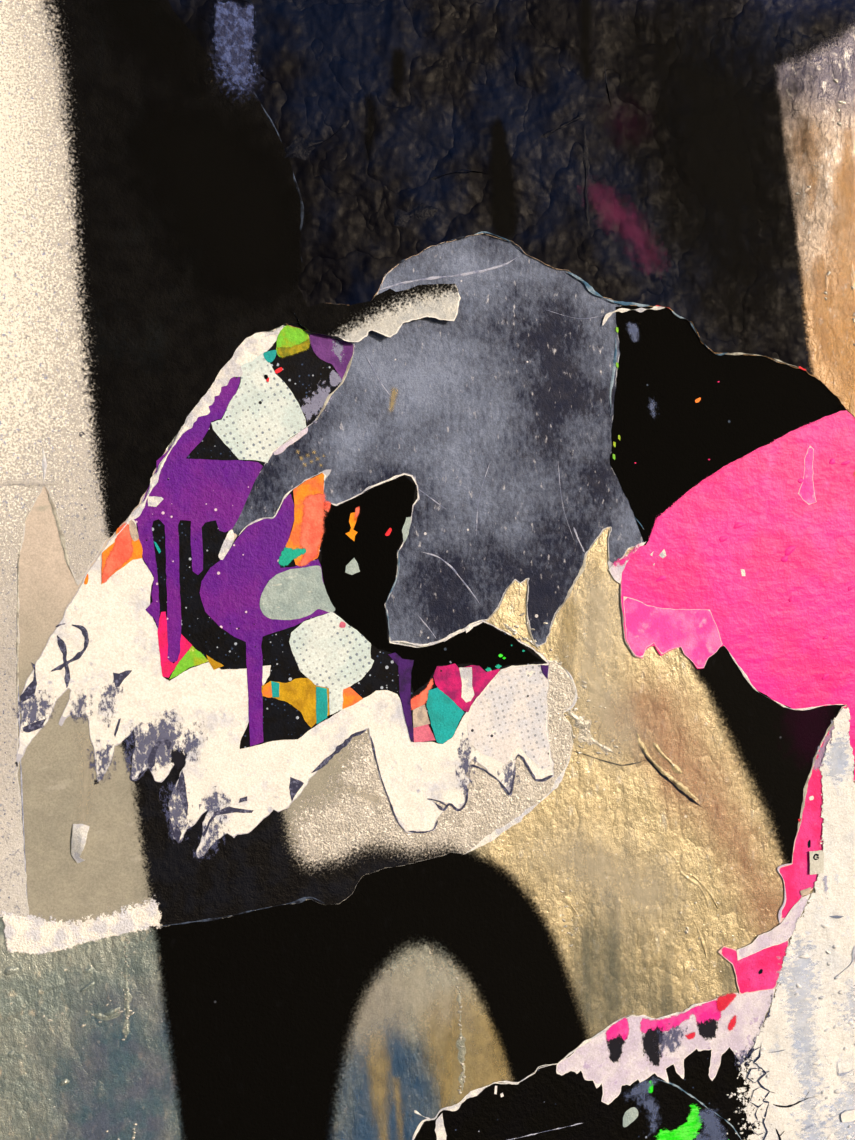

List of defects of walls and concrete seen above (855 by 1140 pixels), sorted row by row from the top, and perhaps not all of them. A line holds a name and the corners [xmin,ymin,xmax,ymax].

peeling [503,602,568,672]
crack [571,727,703,808]
peeling [841,1110,855,1123]